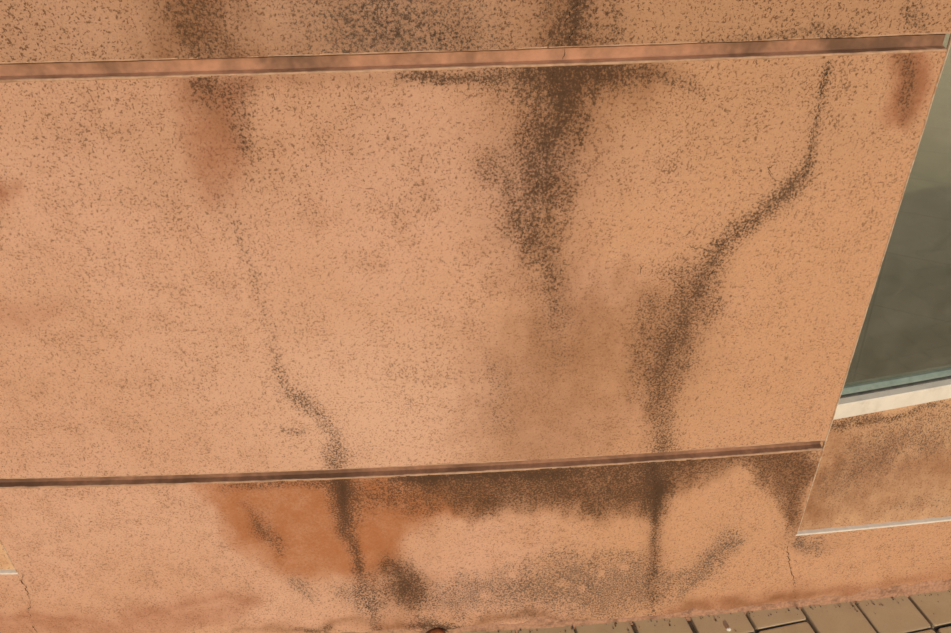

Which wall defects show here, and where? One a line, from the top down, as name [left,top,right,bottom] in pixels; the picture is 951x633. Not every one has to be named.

leakage [104,0,509,60]
crack [499,0,666,153]
leakage [874,52,940,137]
crack [213,205,359,470]
leakage [155,61,722,463]
crack [627,56,841,593]
crack [278,498,384,623]
rust [179,476,485,587]
leakage [0,398,951,633]